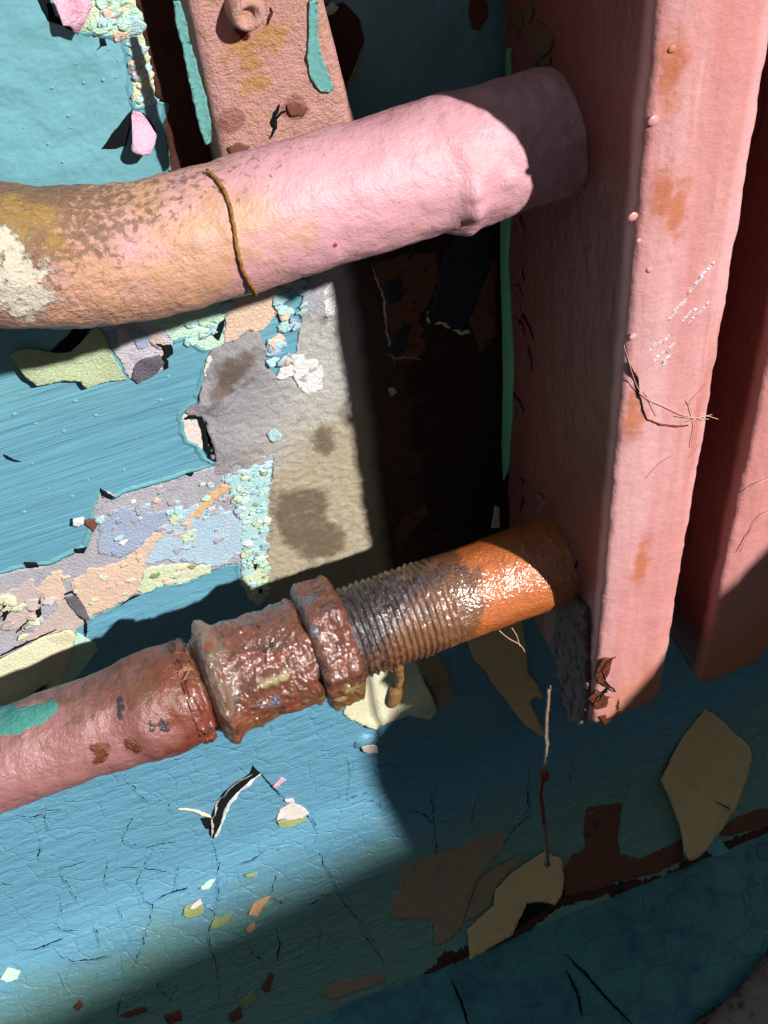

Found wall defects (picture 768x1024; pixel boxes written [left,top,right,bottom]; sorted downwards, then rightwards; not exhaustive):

peeling [38,0,212,172]
damp [214,356,253,400]
flaking render [0,222,510,707]
damp [276,490,345,558]
damp [316,428,334,453]
peeling [660,709,768,861]
crack [5,753,401,1016]
peeling [390,829,569,960]